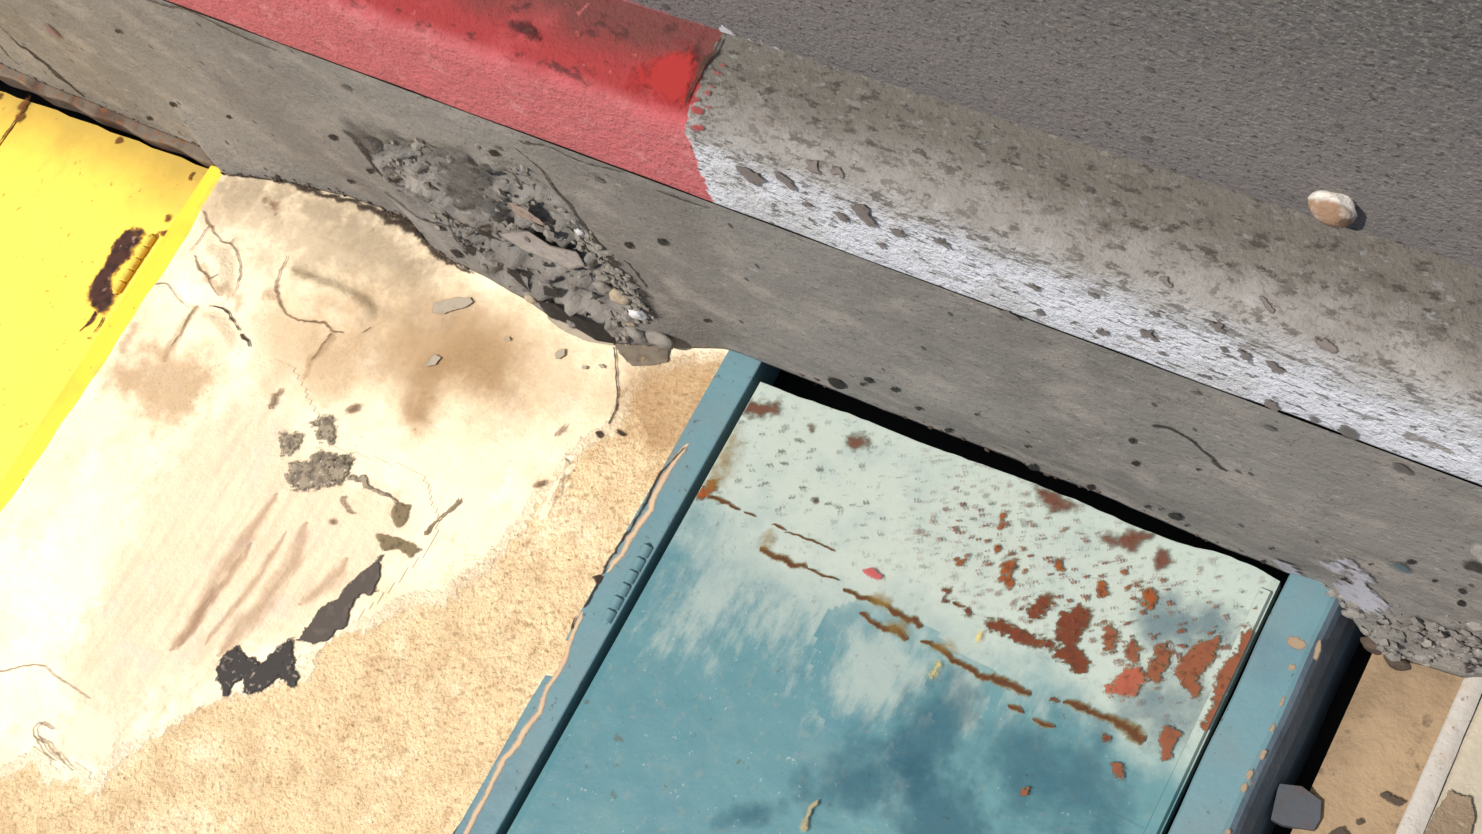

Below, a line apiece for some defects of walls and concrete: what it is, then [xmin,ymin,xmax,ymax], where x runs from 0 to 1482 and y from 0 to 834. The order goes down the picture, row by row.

crack [225,130,470,274]
crack [155,210,250,347]
crack [274,255,371,360]
leakage [41,358,440,765]
peeling [0,186,725,834]
corrosion [695,455,835,552]
corrosion [846,434,870,449]
corrosion [759,546,1055,728]
corrosion [923,475,1257,762]
corrosion [1110,762,1125,782]